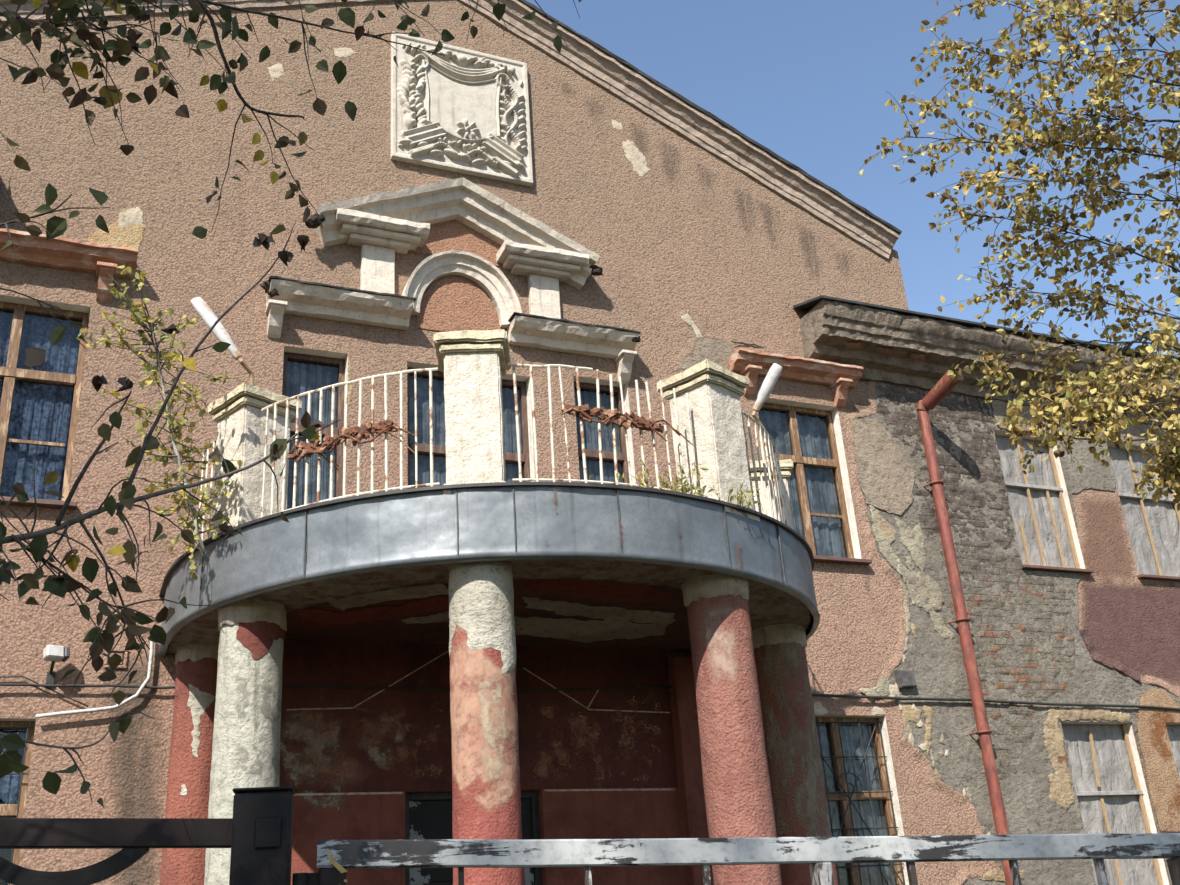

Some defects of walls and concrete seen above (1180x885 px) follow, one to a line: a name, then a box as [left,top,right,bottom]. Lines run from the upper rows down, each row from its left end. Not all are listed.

peeling [612,120,650,177]
peeling [84,207,146,249]
peeling [854,382,1180,835]
damp [1084,504,1180,681]
peeling [236,621,285,660]
peeling [187,684,215,757]
peeling [236,677,346,810]
peeling [328,561,676,811]
peeling [814,701,828,716]
peeling [963,861,1006,885]
peeling [1017,859,1096,885]